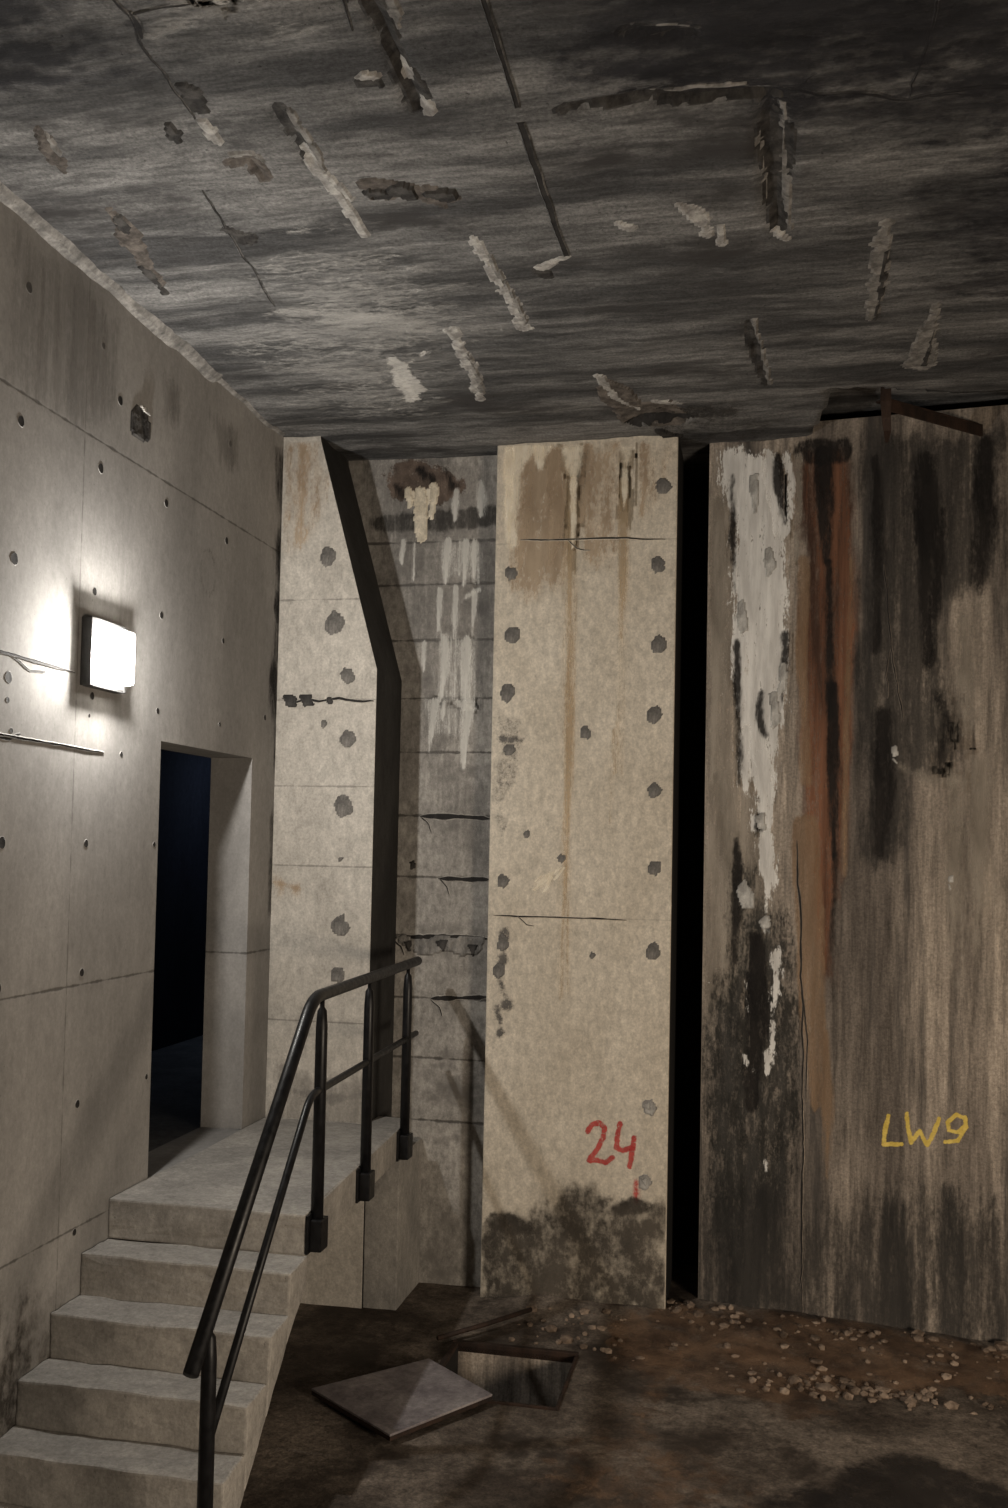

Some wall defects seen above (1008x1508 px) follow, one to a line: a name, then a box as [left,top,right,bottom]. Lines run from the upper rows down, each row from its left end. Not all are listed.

spalling [272,102,462,238]
spalling [552,81,798,247]
crack [202,191,275,307]
crack [0,649,75,674]
crack [0,732,104,754]
damp [373,443,665,768]
peeling [717,444,796,934]
rust [792,438,855,1150]
damp [699,426,1007,1343]
damp [495,927,512,1037]
peeling [742,945,784,1076]
damp [481,1187,666,1310]